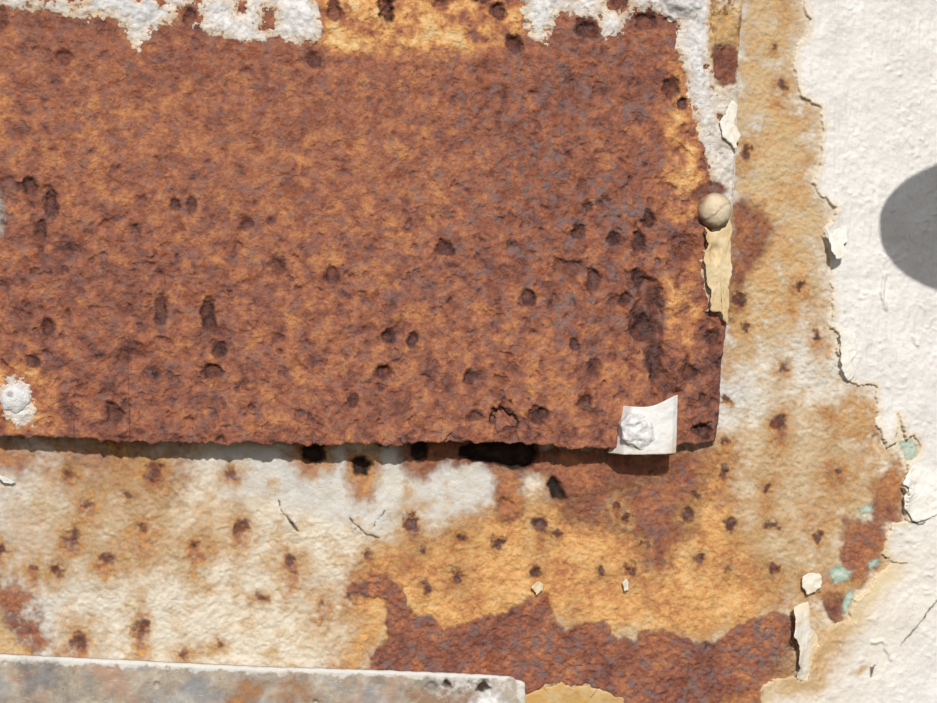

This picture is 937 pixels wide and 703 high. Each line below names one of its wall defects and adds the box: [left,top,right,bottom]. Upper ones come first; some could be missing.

spalling [662,76,685,109]
peeling [719,100,741,149]
rust [692,182,726,202]
rust [714,0,825,366]
peeling [825,227,848,259]
peeling [839,331,857,381]
rust [765,407,793,459]
peeling [903,465,937,522]
rust [0,436,186,659]
rust [308,433,799,703]
rust [802,458,904,623]
peeling [793,573,822,681]